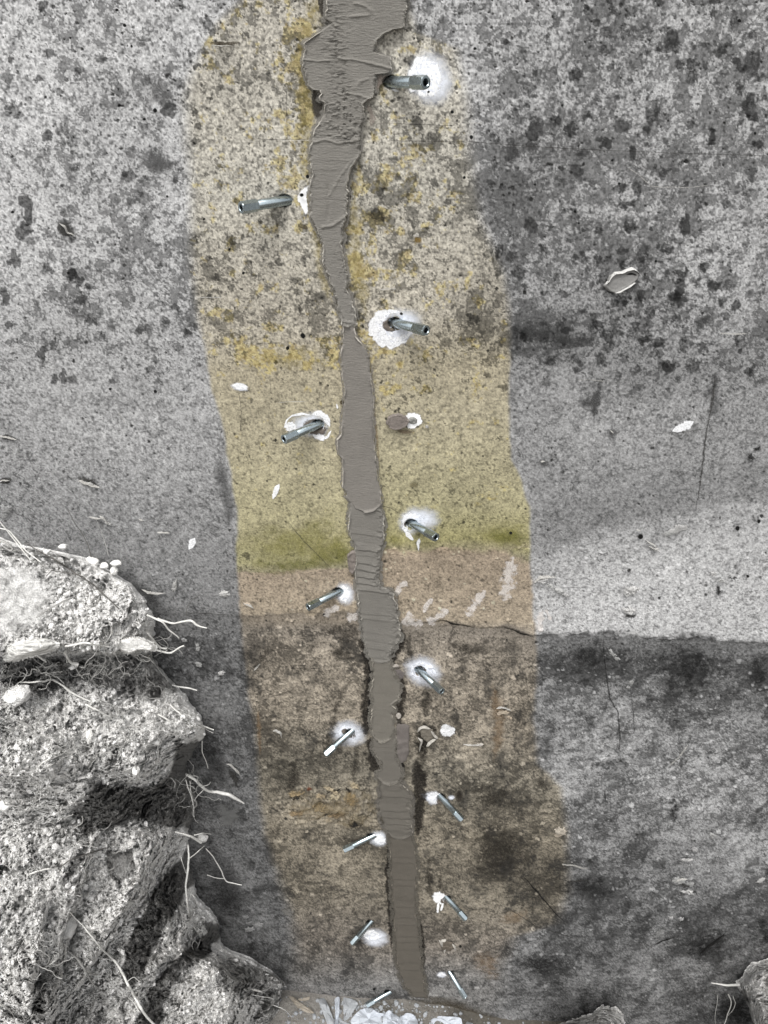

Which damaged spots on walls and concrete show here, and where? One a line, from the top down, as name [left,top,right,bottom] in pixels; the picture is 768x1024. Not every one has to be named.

crack [250,0,768,999]